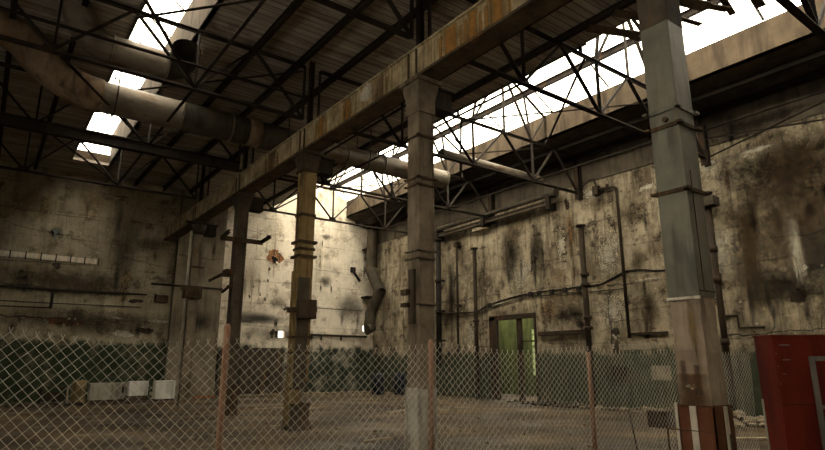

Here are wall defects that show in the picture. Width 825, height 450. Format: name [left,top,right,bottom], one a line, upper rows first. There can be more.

rust [439,0,511,58]
water stain [505,241,522,281]
water stain [531,227,544,283]
water stain [726,138,825,320]